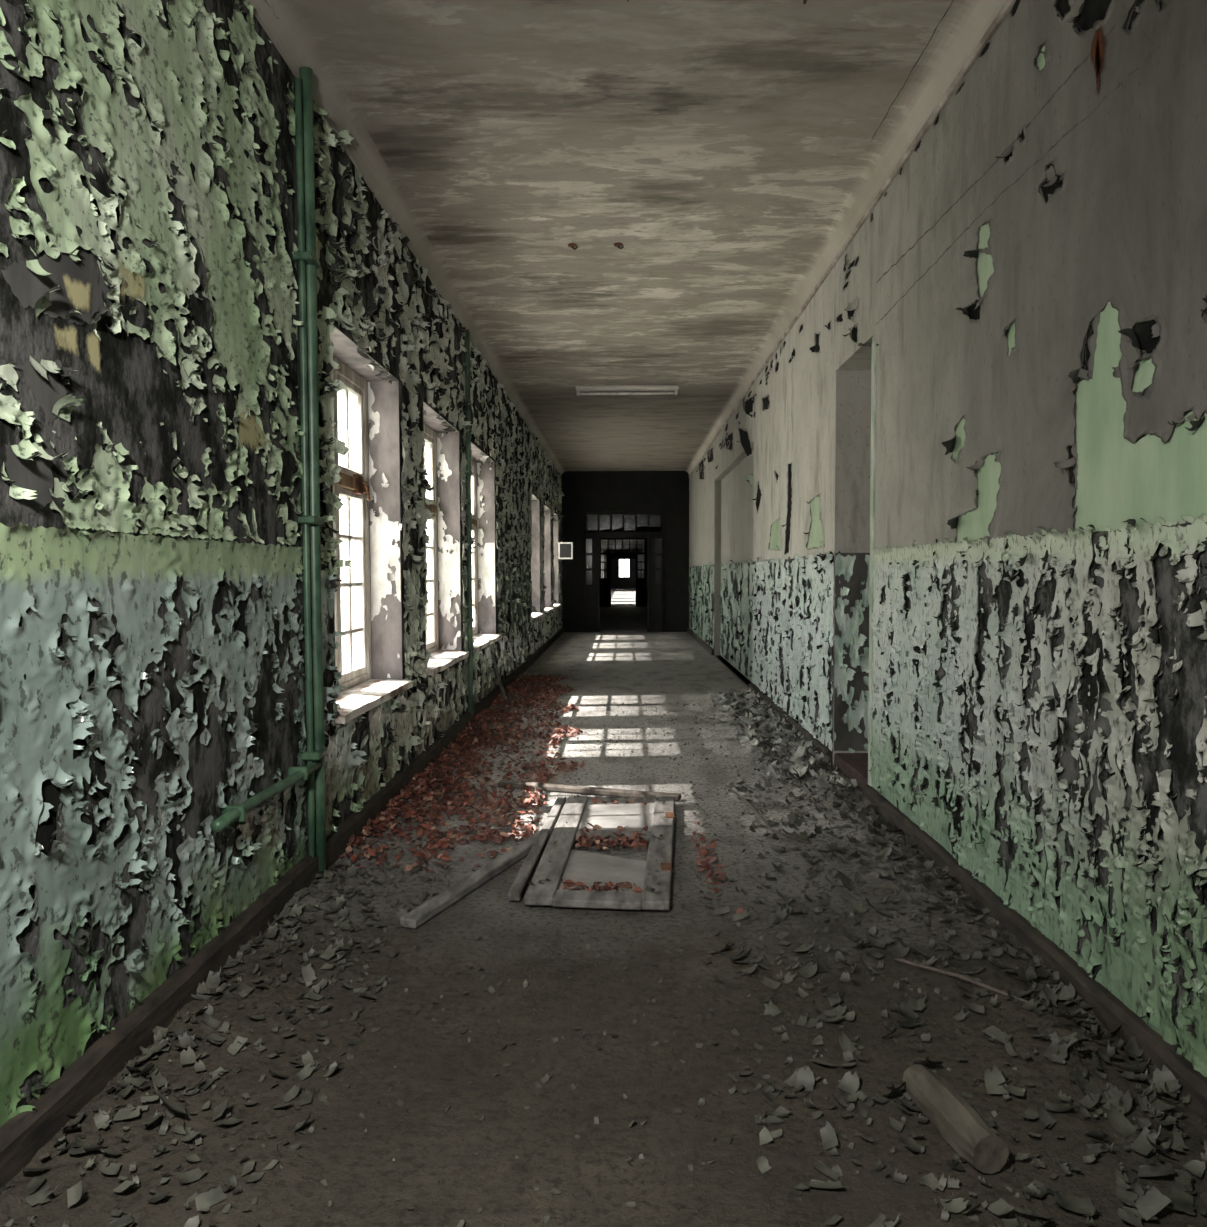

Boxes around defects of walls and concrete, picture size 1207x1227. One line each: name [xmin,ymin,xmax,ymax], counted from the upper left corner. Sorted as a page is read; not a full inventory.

peeling [1053,0,1172,39]
peeling [696,252,861,480]
peeling [956,218,997,324]
peeling [0,0,564,1127]
peeling [688,294,1207,1077]